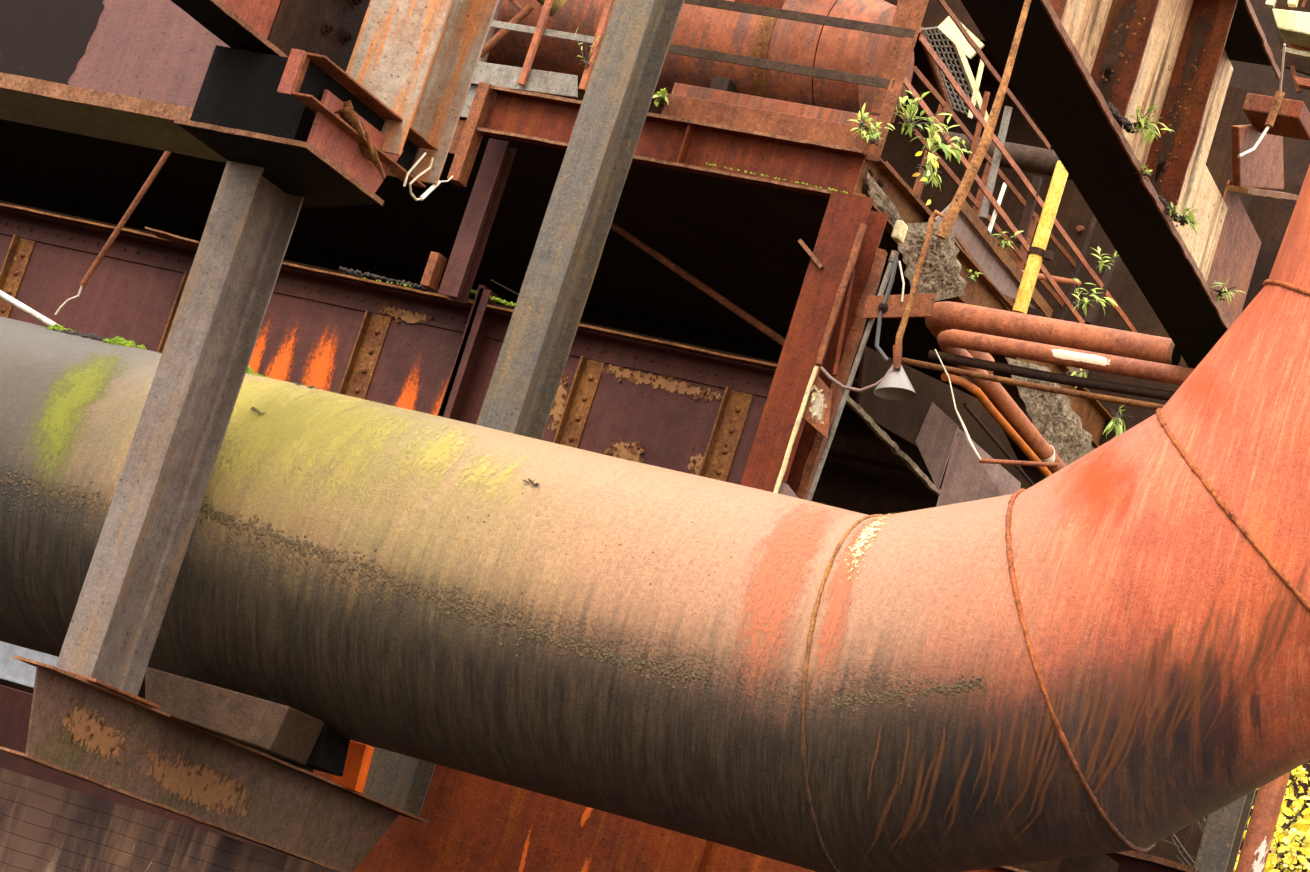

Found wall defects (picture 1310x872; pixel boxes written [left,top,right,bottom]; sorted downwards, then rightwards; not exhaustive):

corrosion [1149,11,1215,195]
corrosion [249,328,336,391]
corrosion [395,369,419,410]
peeling [547,374,568,430]
peeling [590,359,724,402]
peeling [604,438,645,463]
peeling [688,444,728,478]
corrosion [702,503,840,684]
corrosion [947,587,1300,838]
corrosion [580,807,593,827]
corrosion [872,734,943,846]
corrosion [518,830,531,872]